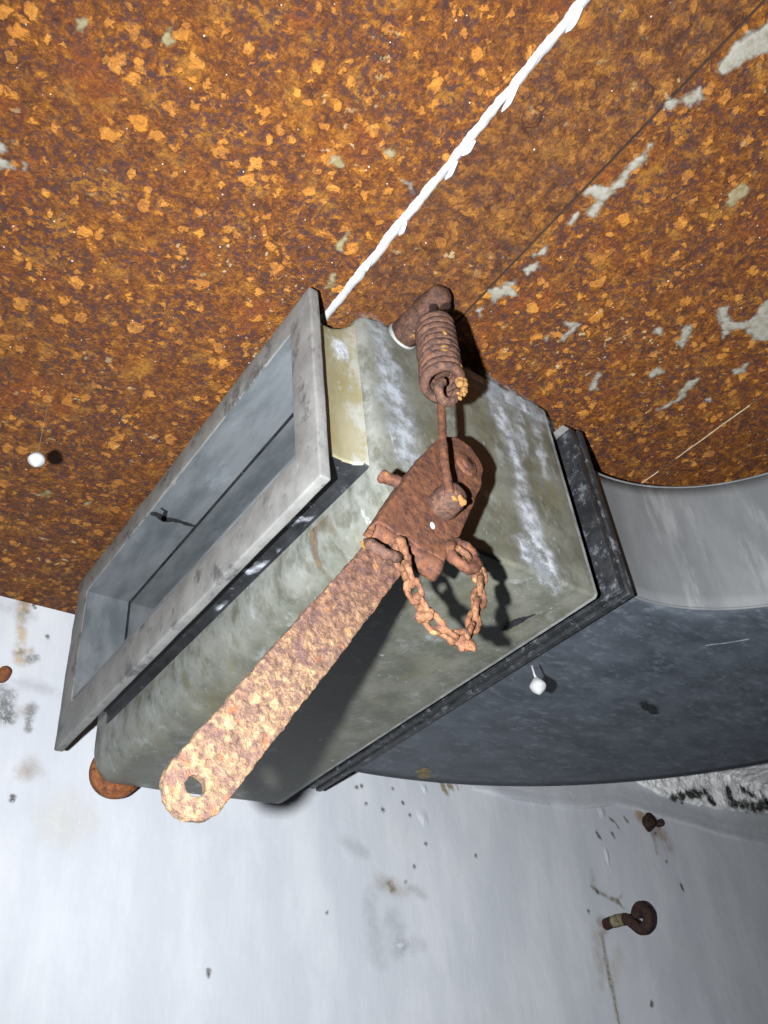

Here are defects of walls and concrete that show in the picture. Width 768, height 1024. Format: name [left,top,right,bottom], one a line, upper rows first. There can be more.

peeling [718,23,768,75]
peeling [501,53,540,113]
peeling [665,87,702,110]
peeling [568,143,653,225]
peeling [727,183,749,206]
peeling [524,247,547,275]
peeling [488,282,517,302]
peeling [562,322,580,341]
peeling [676,325,692,347]
peeling [717,300,768,341]
peeling [657,378,699,409]